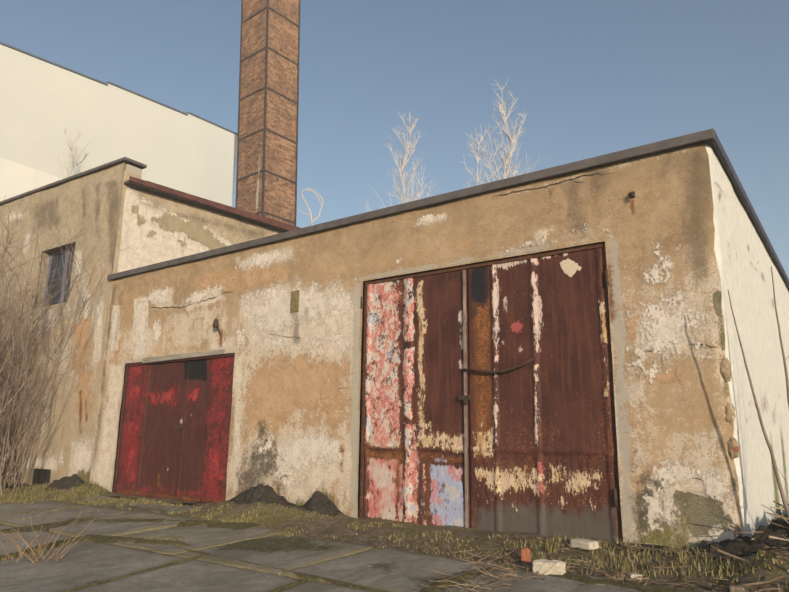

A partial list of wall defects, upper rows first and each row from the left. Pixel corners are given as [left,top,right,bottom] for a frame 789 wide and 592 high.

peeling [131,192,226,251]
crack [494,172,608,197]
flaking render [38,249,120,417]
peeling [119,282,225,486]
crack [151,292,232,315]
flaking render [203,223,602,527]
rust [473,300,493,459]
peeling [598,299,607,344]
peeling [616,239,725,392]
rust [365,449,404,500]
water stain [636,474,658,541]
spalling [633,457,738,547]